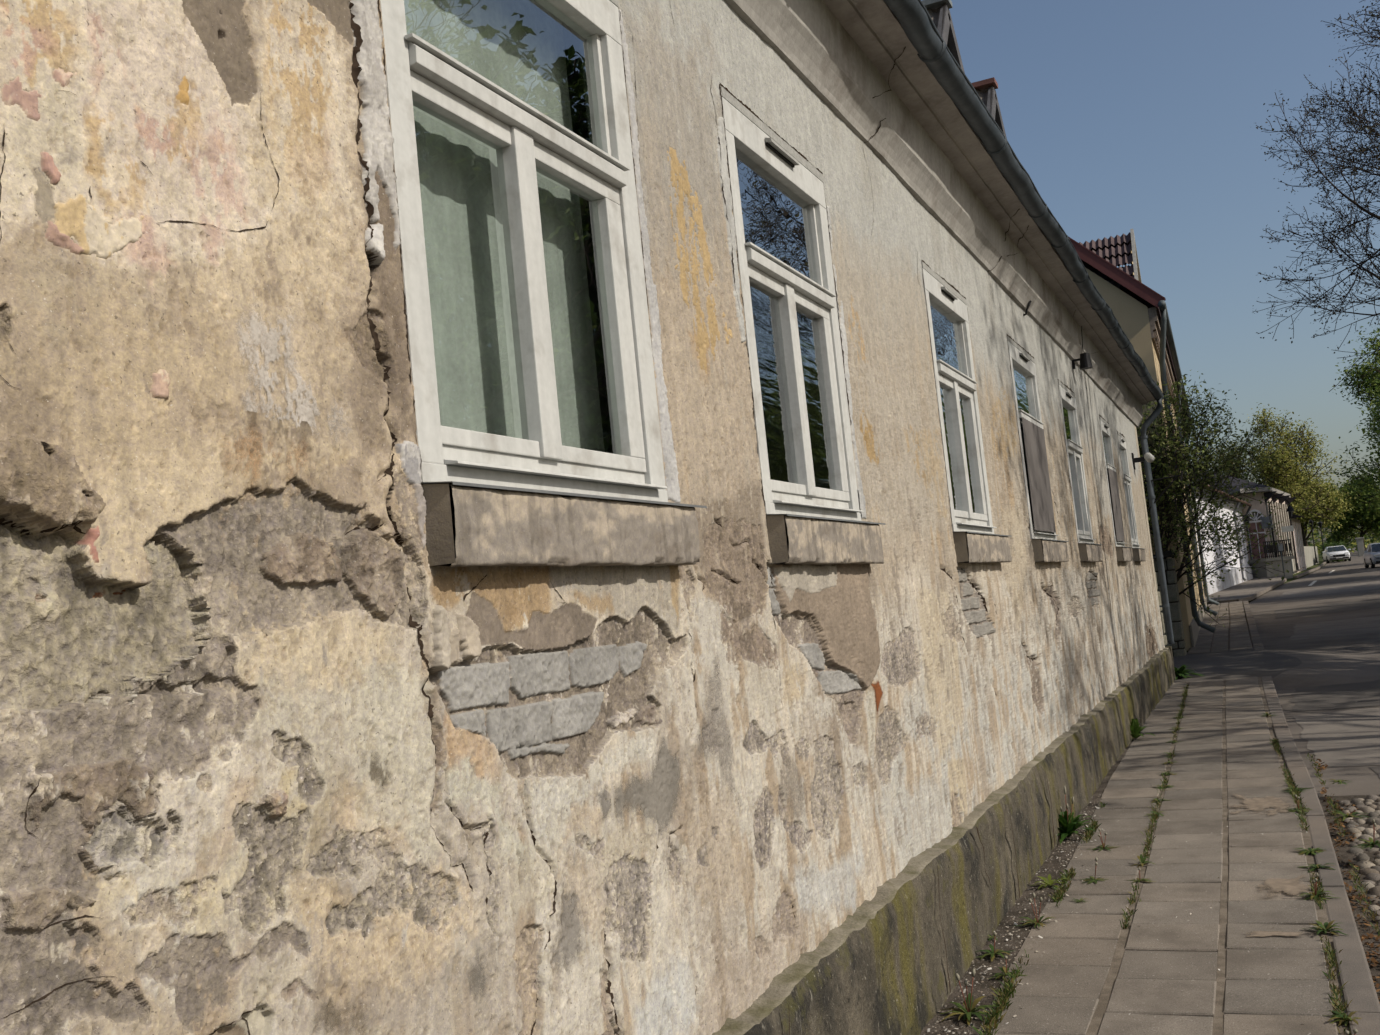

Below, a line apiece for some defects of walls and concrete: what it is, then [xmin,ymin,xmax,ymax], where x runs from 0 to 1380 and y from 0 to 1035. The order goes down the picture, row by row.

peeling [176,76,189,105]
flaking render [182,0,258,106]
flaking render [307,0,354,45]
crack [0,129,8,241]
crack [158,119,280,232]
crack [345,1,492,914]
flaking render [940,566,996,643]
spalling [1041,521,1113,646]
spalling [0,464,937,1035]
crack [4,976,124,1018]
crack [44,915,100,929]
crack [604,909,620,1035]